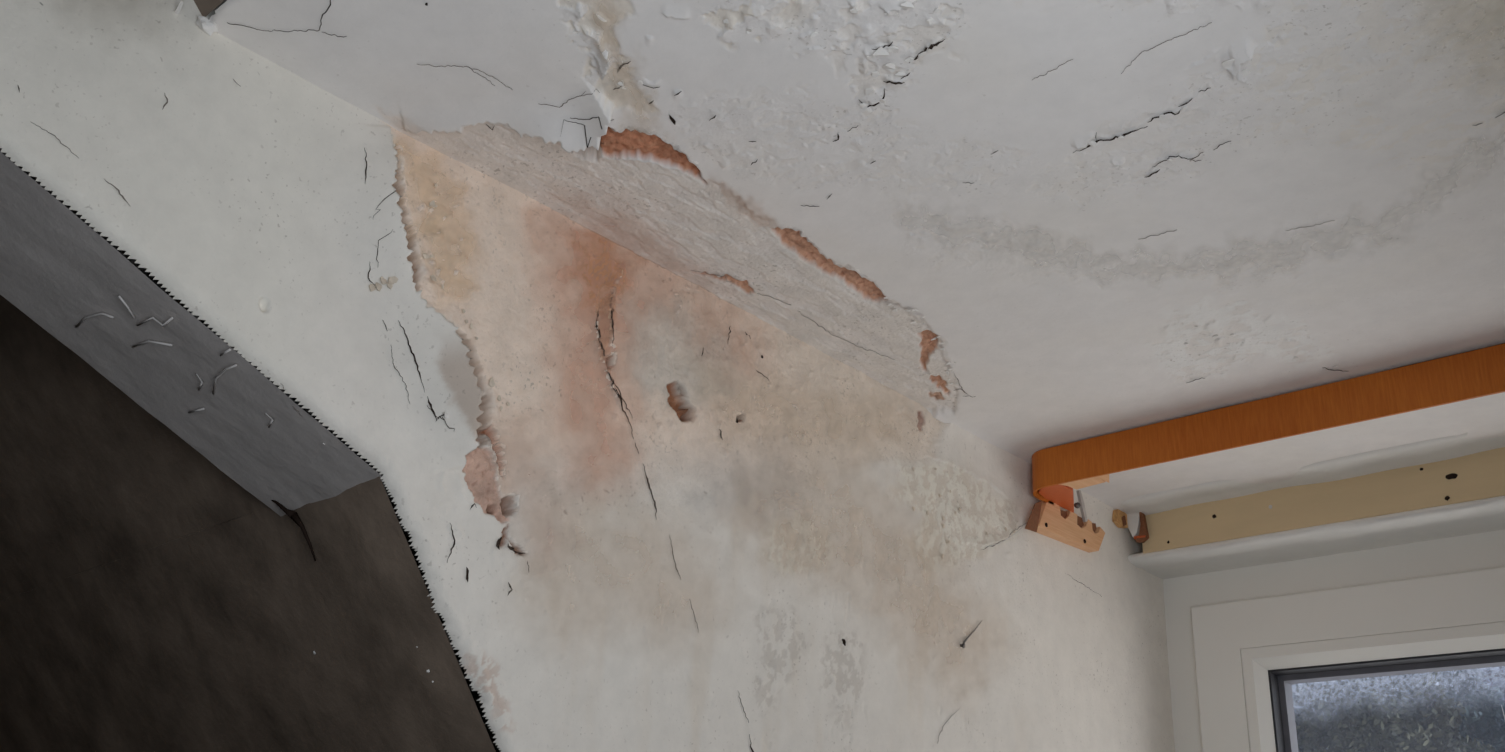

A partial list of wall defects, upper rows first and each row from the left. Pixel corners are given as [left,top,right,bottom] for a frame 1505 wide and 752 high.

crack [228,0,346,37]
crack [1121,22,1212,74]
crack [1073,88,1209,153]
crack [1144,141,1230,178]
flaking render [369,276,398,291]
flaking render [378,0,1505,525]